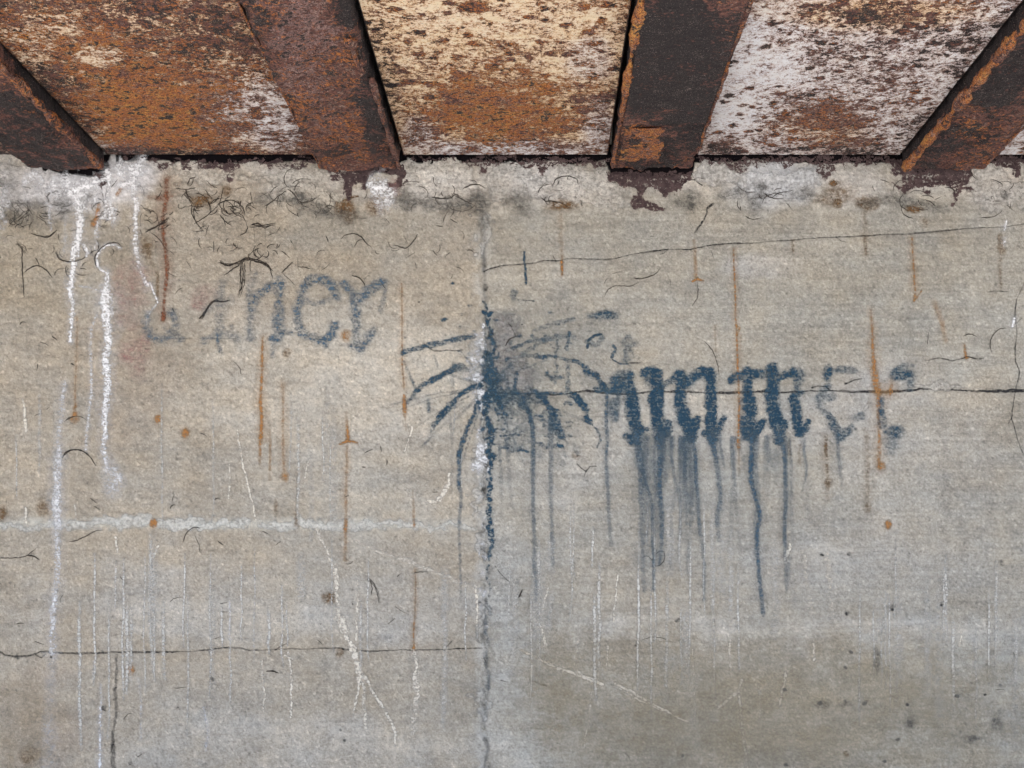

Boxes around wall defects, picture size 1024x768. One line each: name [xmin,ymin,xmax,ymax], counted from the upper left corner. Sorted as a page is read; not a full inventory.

efflorescence [366,176,397,209]
damp [410,194,489,226]
rust [122,154,976,321]
crack [485,178,1014,271]
rust [991,154,1024,180]
damp [0,155,158,492]
rust [733,254,741,449]
crack [488,291,1024,453]
rust [867,310,893,473]
efflorescence [49,384,76,655]
crack [0,646,300,766]
crack [326,642,480,652]